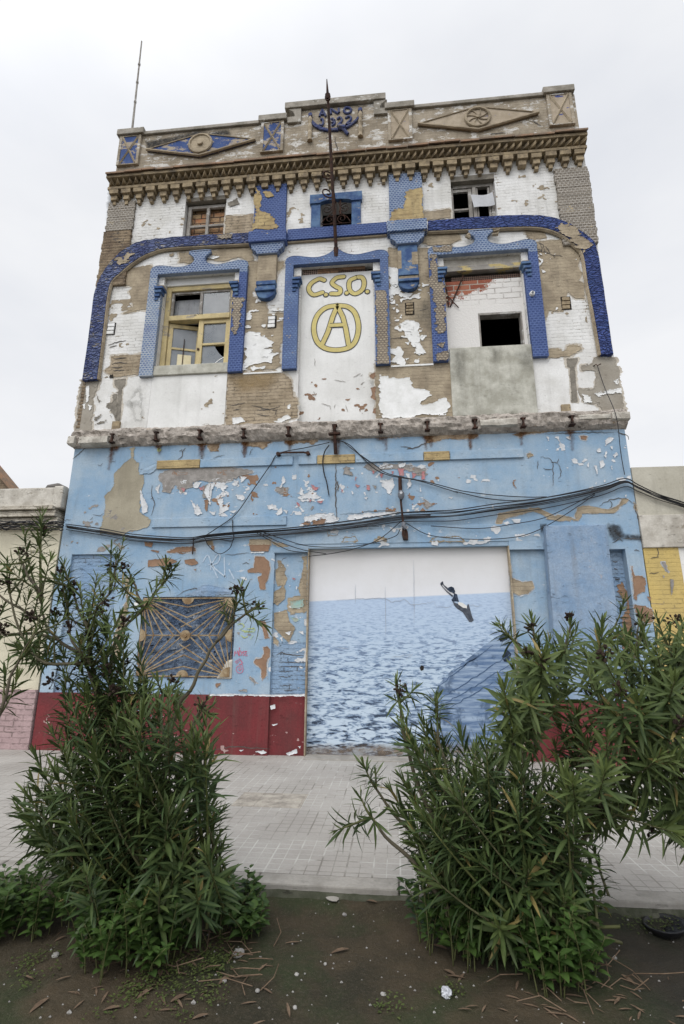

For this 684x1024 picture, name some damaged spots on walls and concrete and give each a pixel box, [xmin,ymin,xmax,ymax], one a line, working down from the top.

peeling [207,187,326,425]
peeling [341,183,462,419]
peeling [73,343,141,431]
peeling [546,343,628,411]
corrosion [276,440,310,457]
crack [537,431,629,482]
peeling [155,462,638,547]
peeling [210,538,308,709]